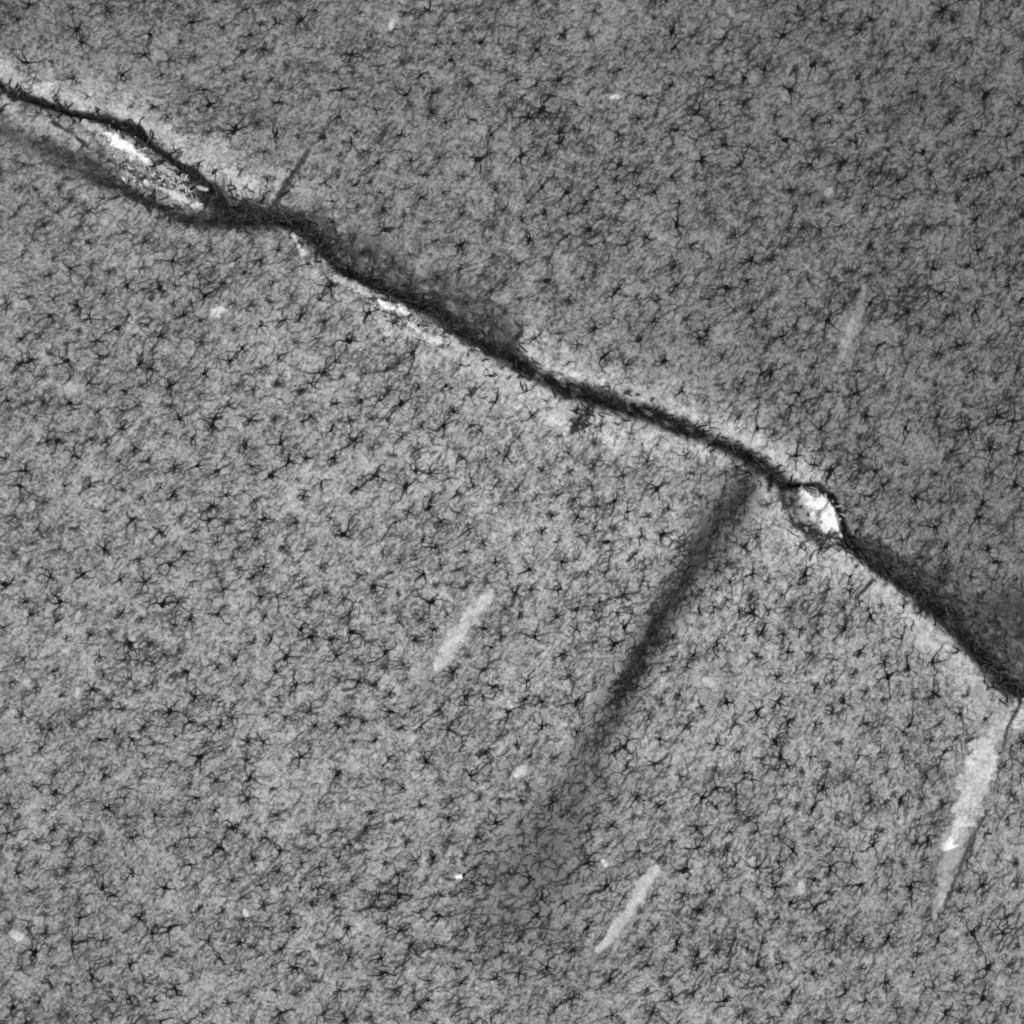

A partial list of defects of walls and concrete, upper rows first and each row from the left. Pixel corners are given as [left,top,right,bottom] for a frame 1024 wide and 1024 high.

crack [0,59,1024,743]